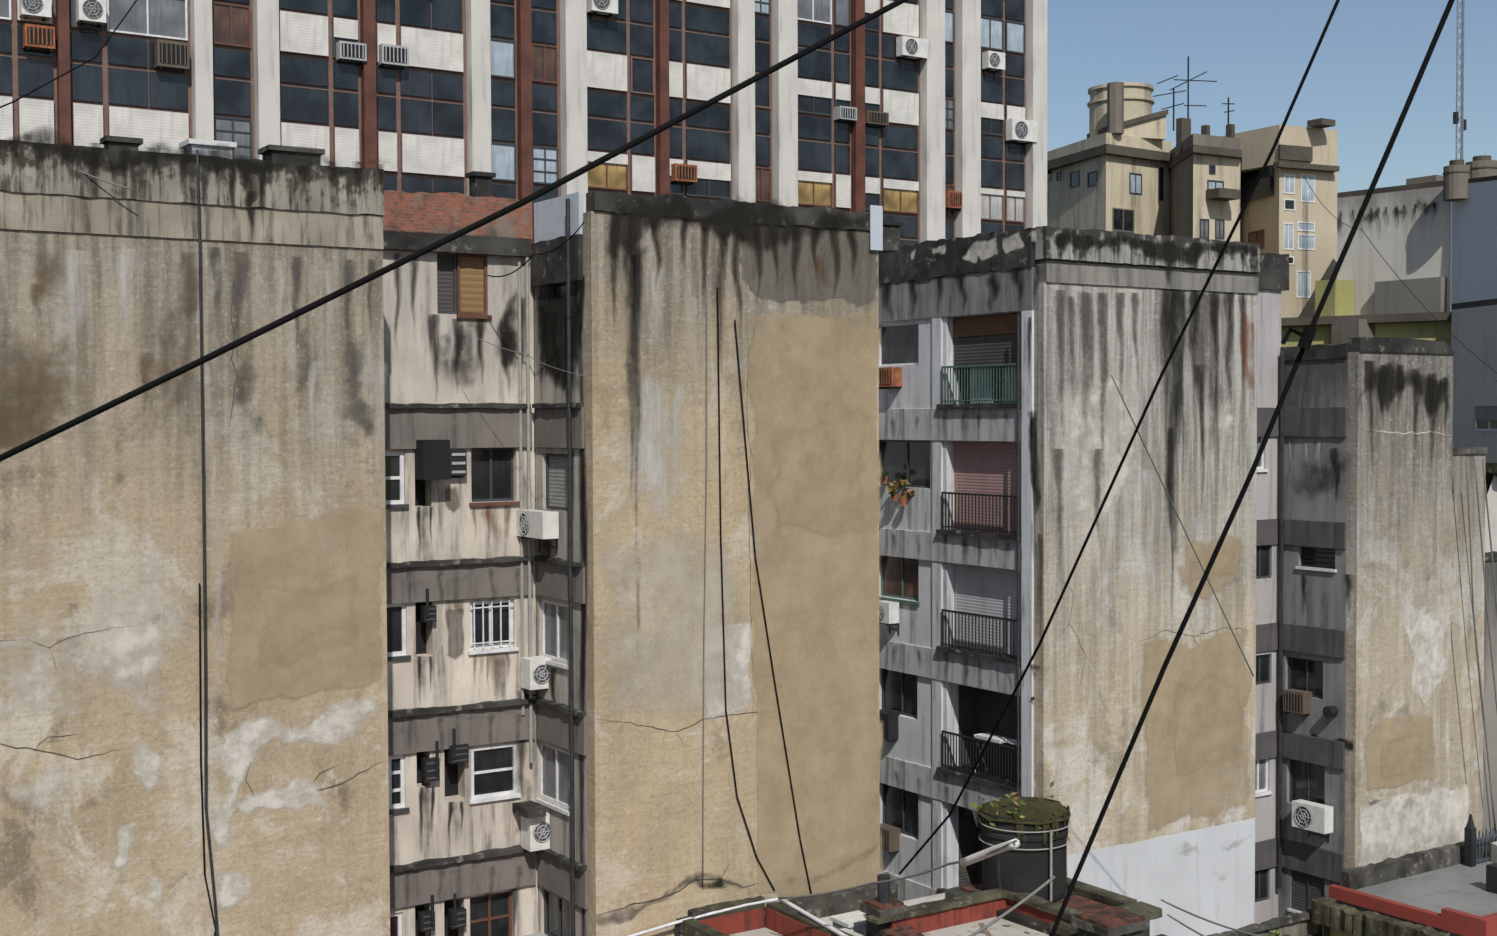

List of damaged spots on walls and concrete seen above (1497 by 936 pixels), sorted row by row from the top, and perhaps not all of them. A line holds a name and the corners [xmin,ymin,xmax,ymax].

leakage [681,218,856,326]
leakage [429,297,558,377]
leakage [610,213,669,503]
leakage [1030,240,1245,552]
leakage [572,448,587,711]
crack [0,624,138,670]
crack [0,734,120,760]
peeling [210,699,379,845]
crack [301,763,378,796]
leakage [419,787,463,830]
peeling [217,873,250,908]
crack [598,866,755,916]